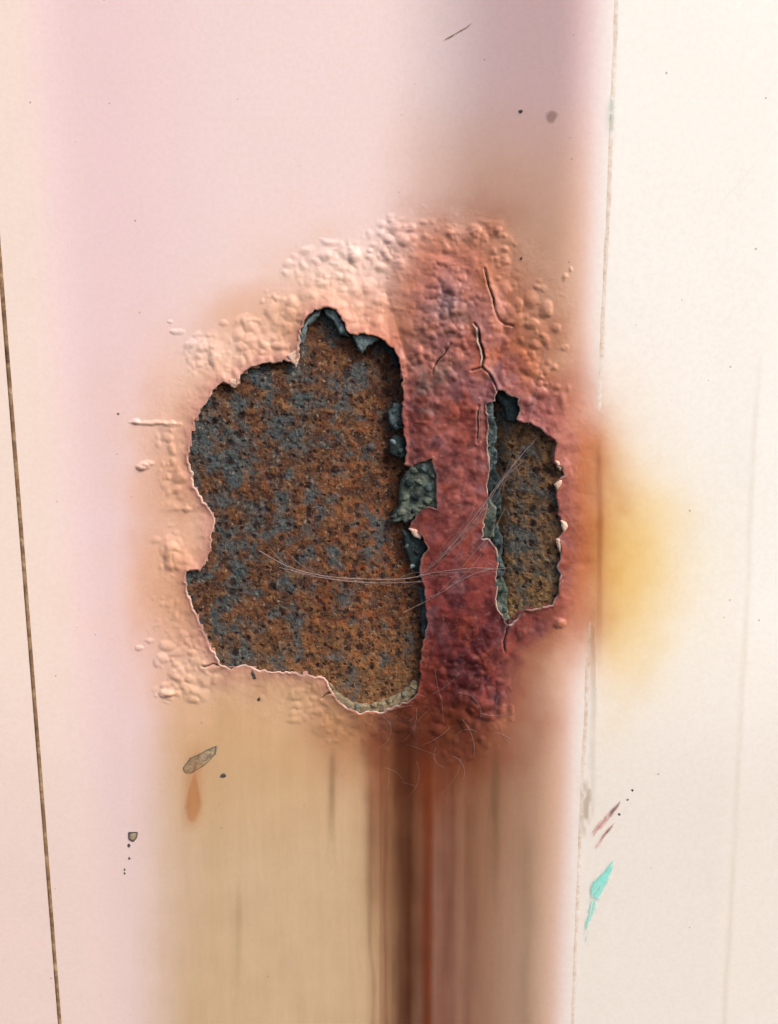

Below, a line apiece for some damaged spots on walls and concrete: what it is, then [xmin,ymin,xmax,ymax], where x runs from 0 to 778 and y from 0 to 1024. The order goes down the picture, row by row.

crack [472,270,497,389]
peeling [183,305,439,715]
peeling [480,388,568,627]